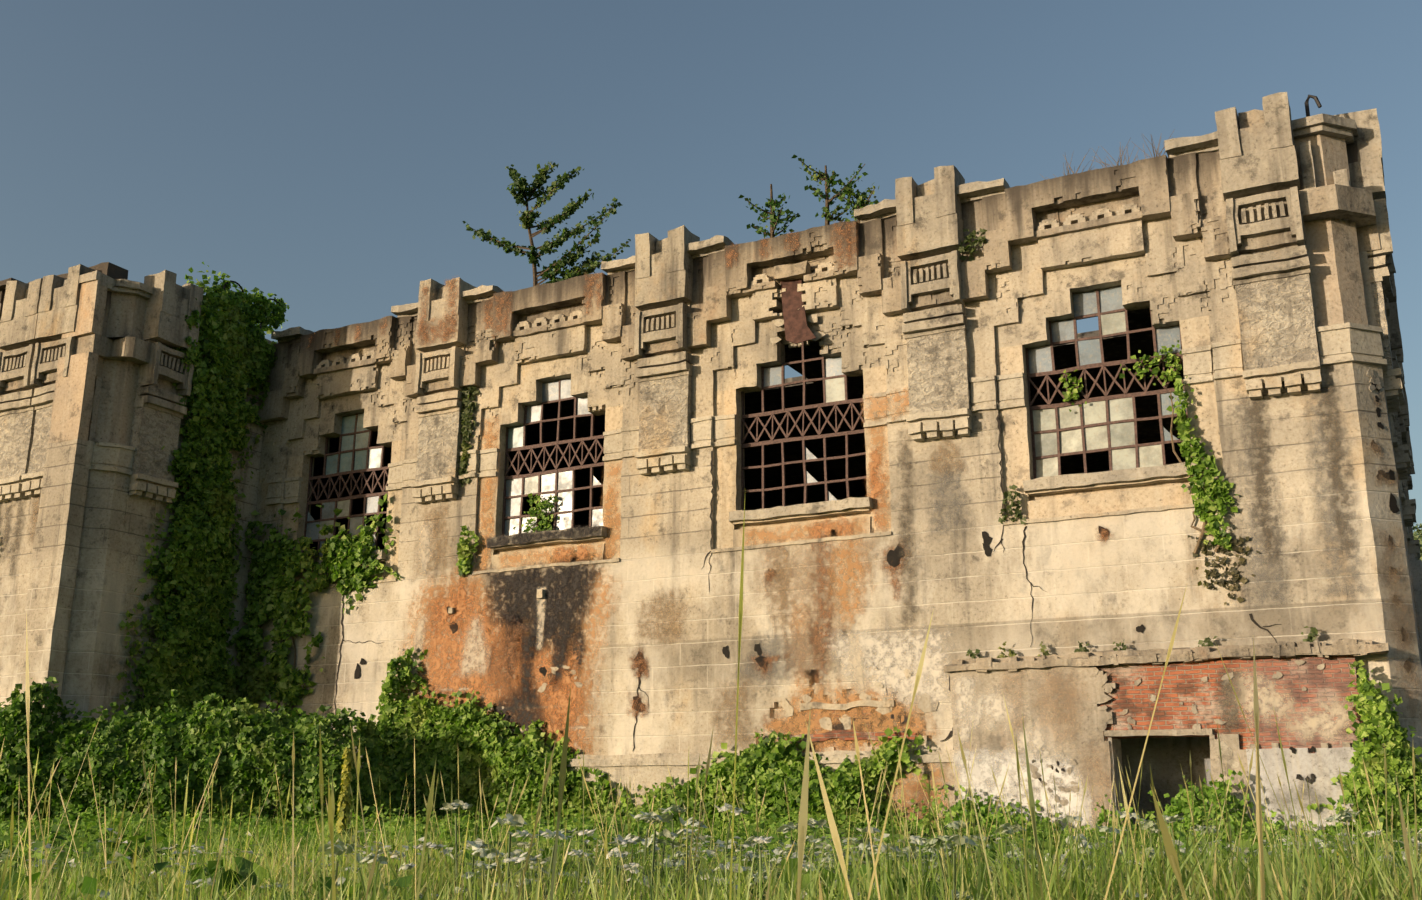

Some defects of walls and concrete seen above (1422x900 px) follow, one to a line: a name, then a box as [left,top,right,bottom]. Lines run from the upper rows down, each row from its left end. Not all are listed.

rust [395,467,621,755]
rust [746,389,909,692]
peeling [766,630,1092,835]
crack [993,414,1044,647]
flaking render [1087,666,1136,733]
water stain [1243,401,1285,602]
flaking render [1179,671,1349,807]
water stain [1314,387,1361,596]